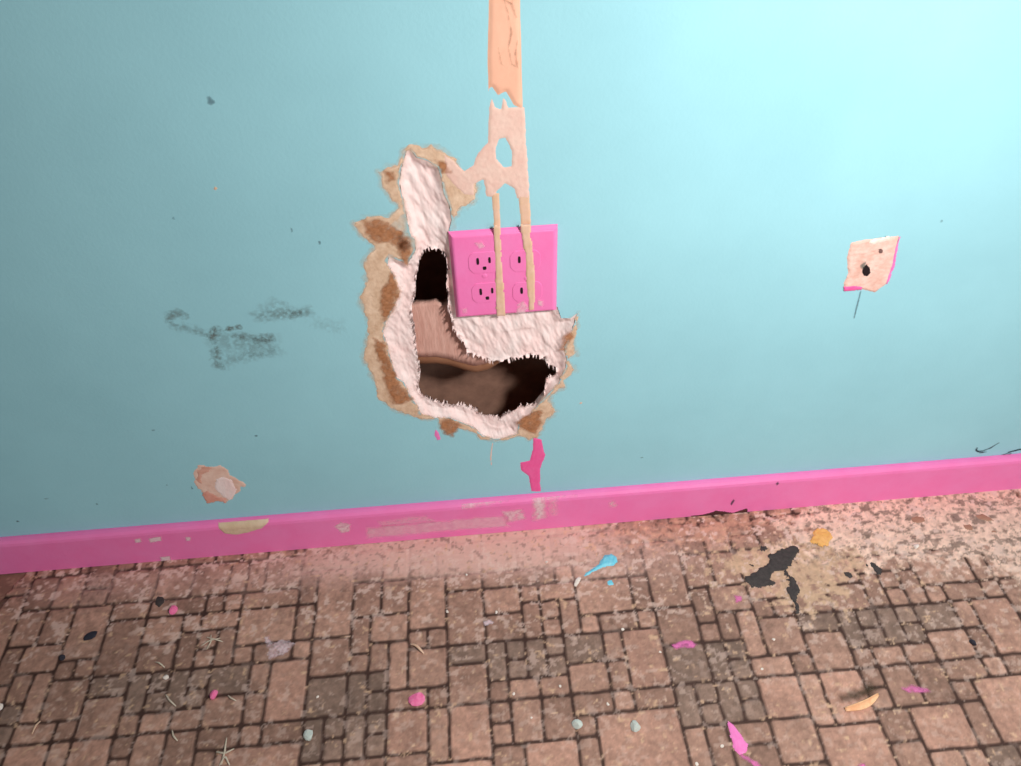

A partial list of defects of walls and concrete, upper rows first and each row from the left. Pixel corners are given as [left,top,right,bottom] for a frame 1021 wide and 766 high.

spalling [354,144,578,440]
peeling [844,236,900,292]
peeling [193,465,246,503]